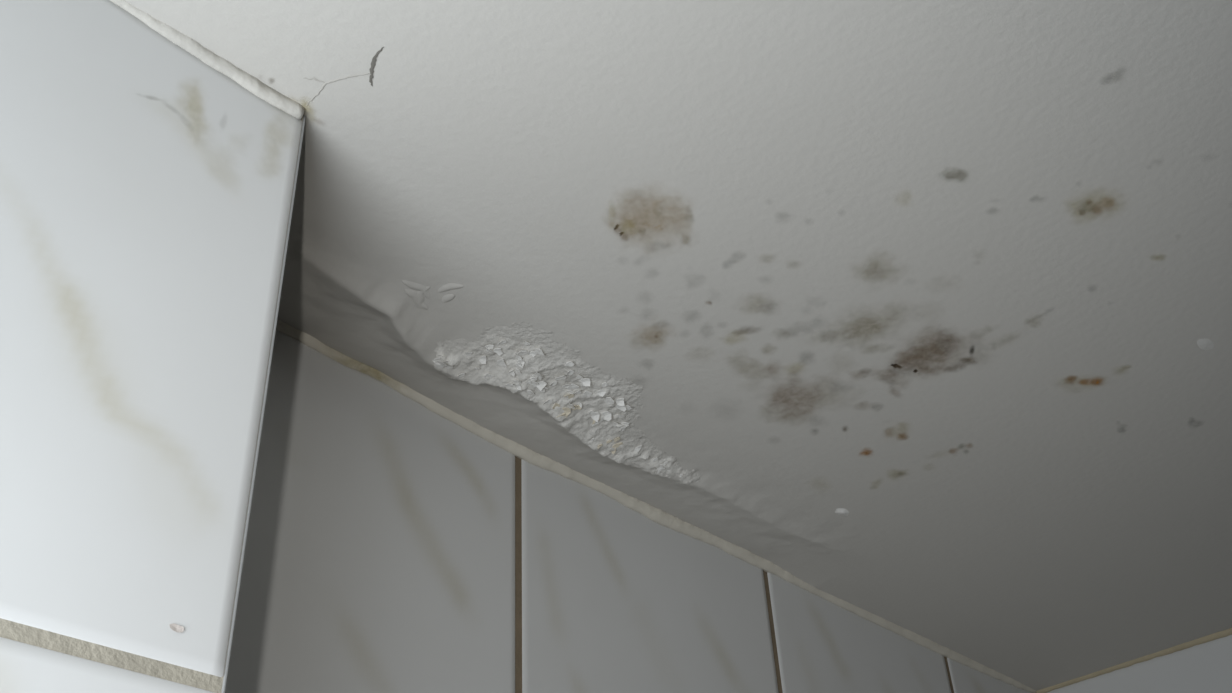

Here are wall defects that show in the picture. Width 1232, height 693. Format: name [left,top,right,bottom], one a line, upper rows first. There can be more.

peeling [432,321,700,485]